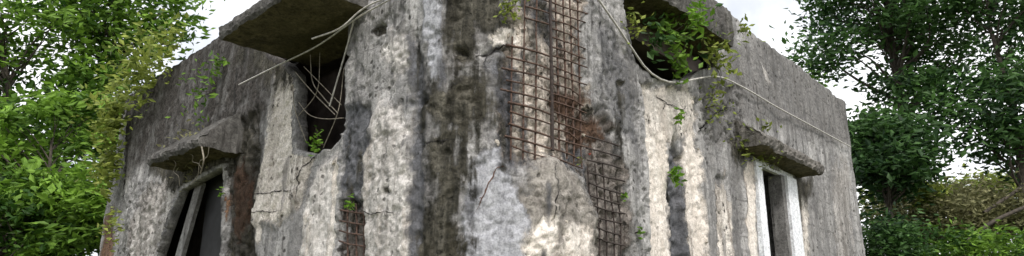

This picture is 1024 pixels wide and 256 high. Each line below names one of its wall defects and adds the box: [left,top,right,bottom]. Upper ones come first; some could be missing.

rust [224,162,254,239]
crack [250,156,315,218]
peeling [251,71,366,256]
leakage [406,0,522,256]
crack [474,166,504,213]
spalling [463,0,632,256]
rust [548,91,605,150]